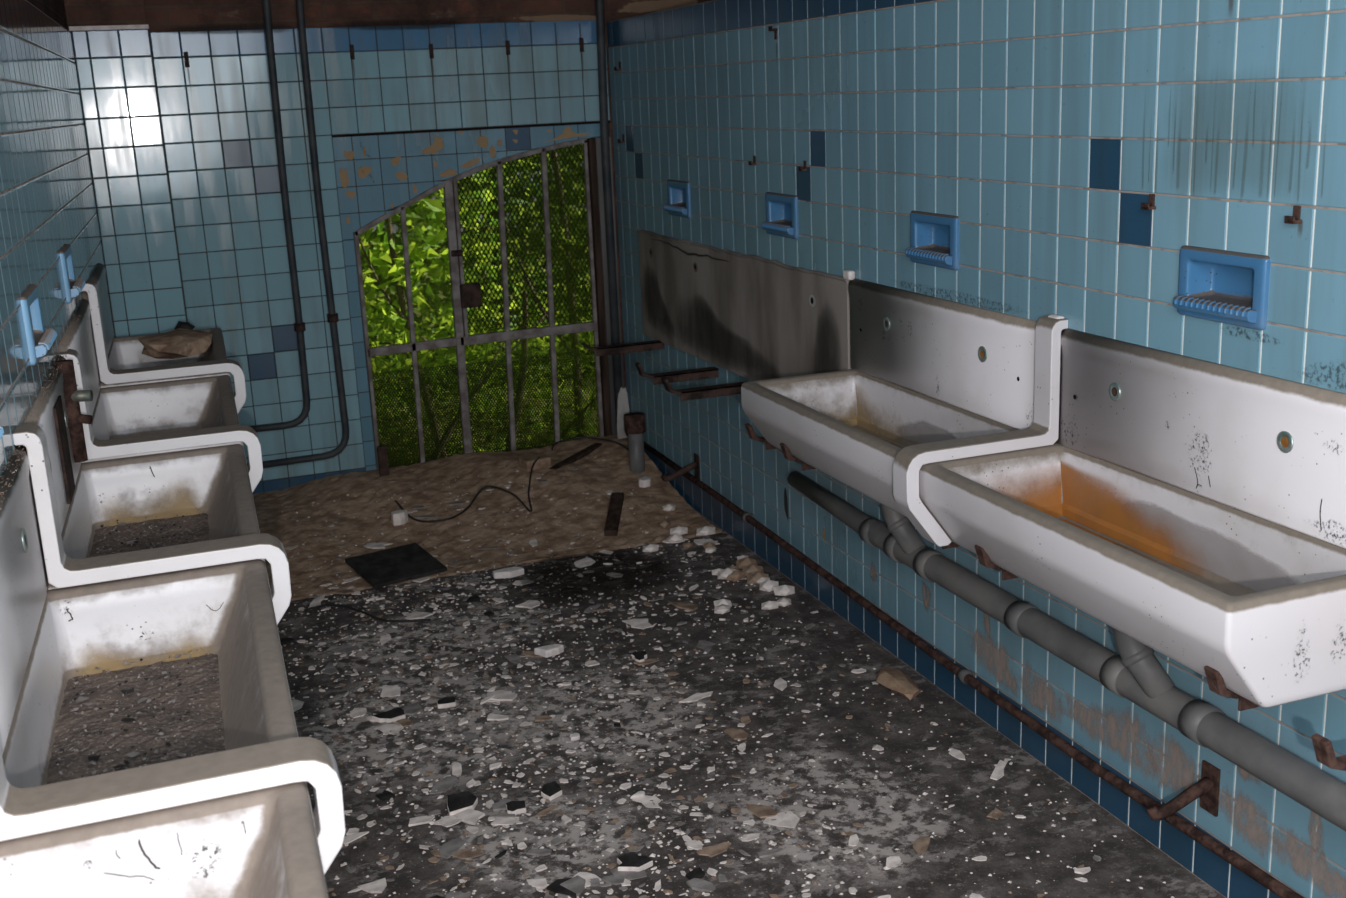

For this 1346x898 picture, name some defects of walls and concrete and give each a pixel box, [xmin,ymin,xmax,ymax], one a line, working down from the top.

spalling [339,146,372,198]
spalling [422,130,518,177]
leakage [816,321,836,373]